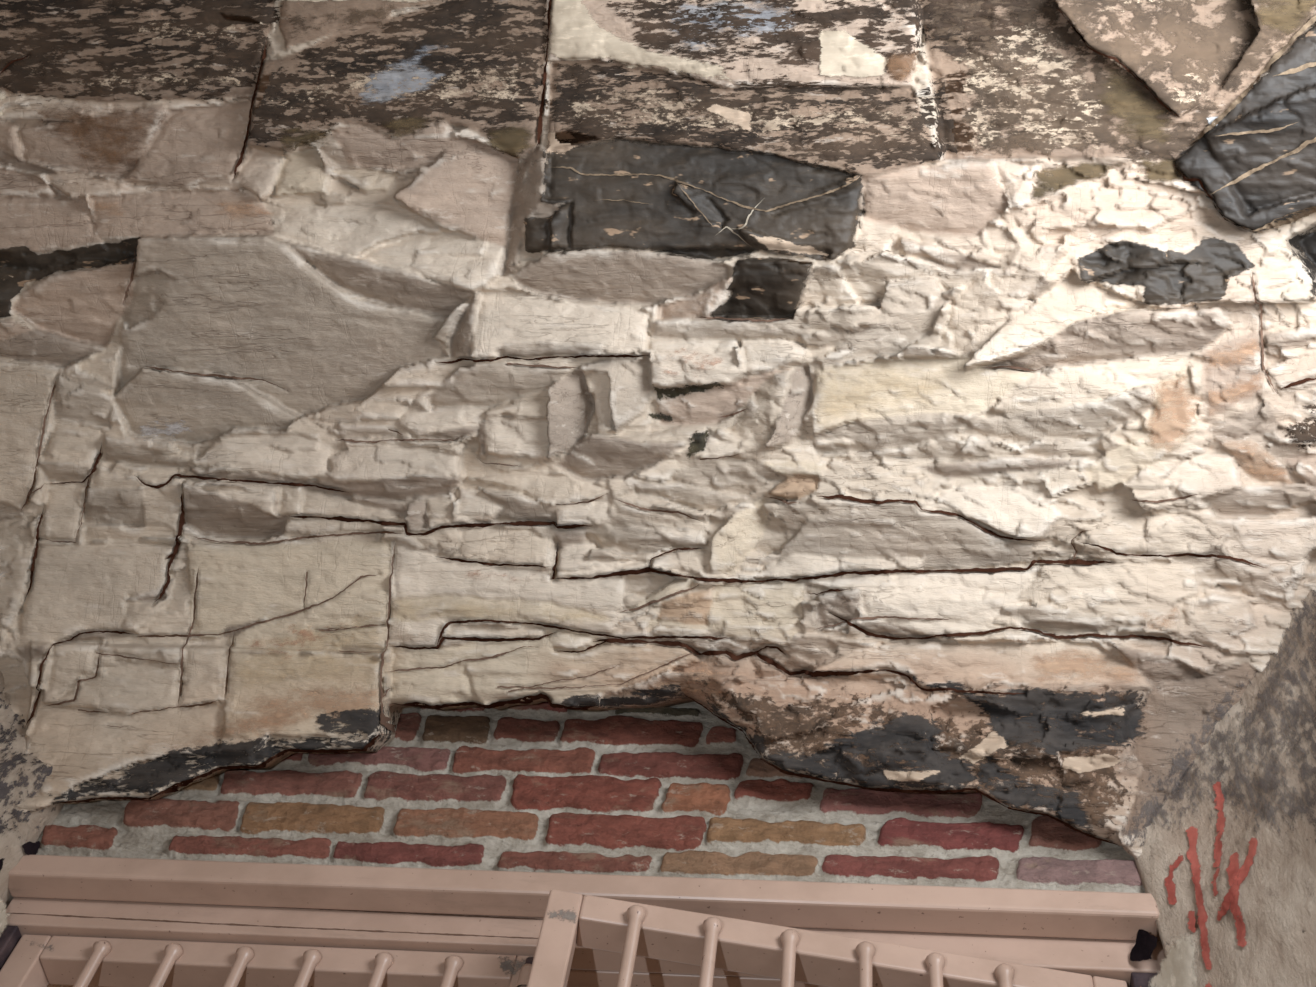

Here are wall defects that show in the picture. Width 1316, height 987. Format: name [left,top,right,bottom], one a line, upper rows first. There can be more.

water stain [671,1,795,50]
water stain [63,62,246,95]
water stain [272,47,525,109]
crack [233,44,266,179]
water stain [569,89,923,140]
crack [21,377,102,601]
crack [25,474,1264,804]
spalling [1081,706,1125,717]
crack [688,697,1119,846]
spalling [884,770,940,782]
spalling [959,731,1007,764]
spalling [1061,753,1123,774]